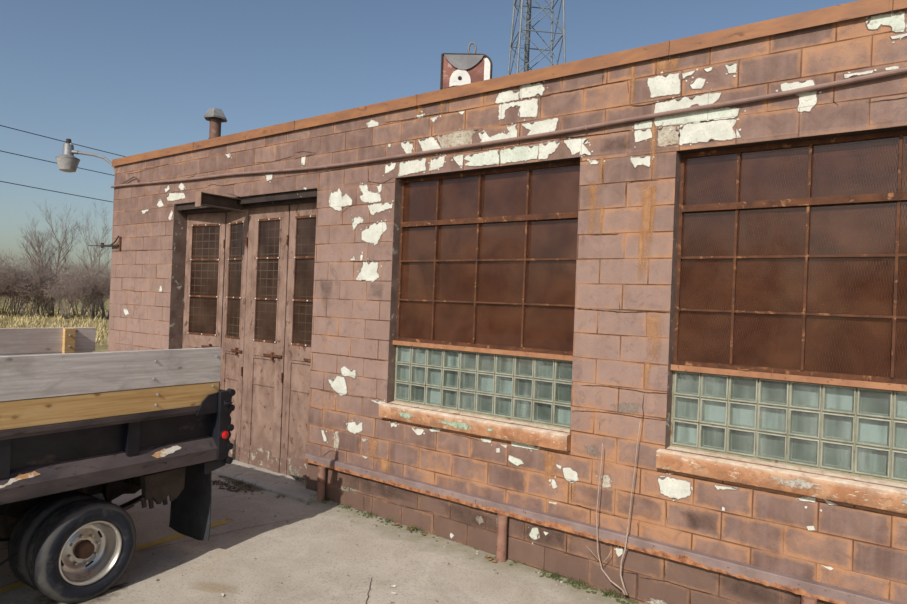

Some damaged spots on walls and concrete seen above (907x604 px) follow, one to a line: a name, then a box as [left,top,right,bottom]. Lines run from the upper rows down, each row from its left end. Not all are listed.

peeling [865,10,907,43]
peeling [725,63,738,77]
peeling [630,66,746,169]
peeling [329,81,605,283]
peeling [328,365,357,397]
peeling [657,473,693,501]